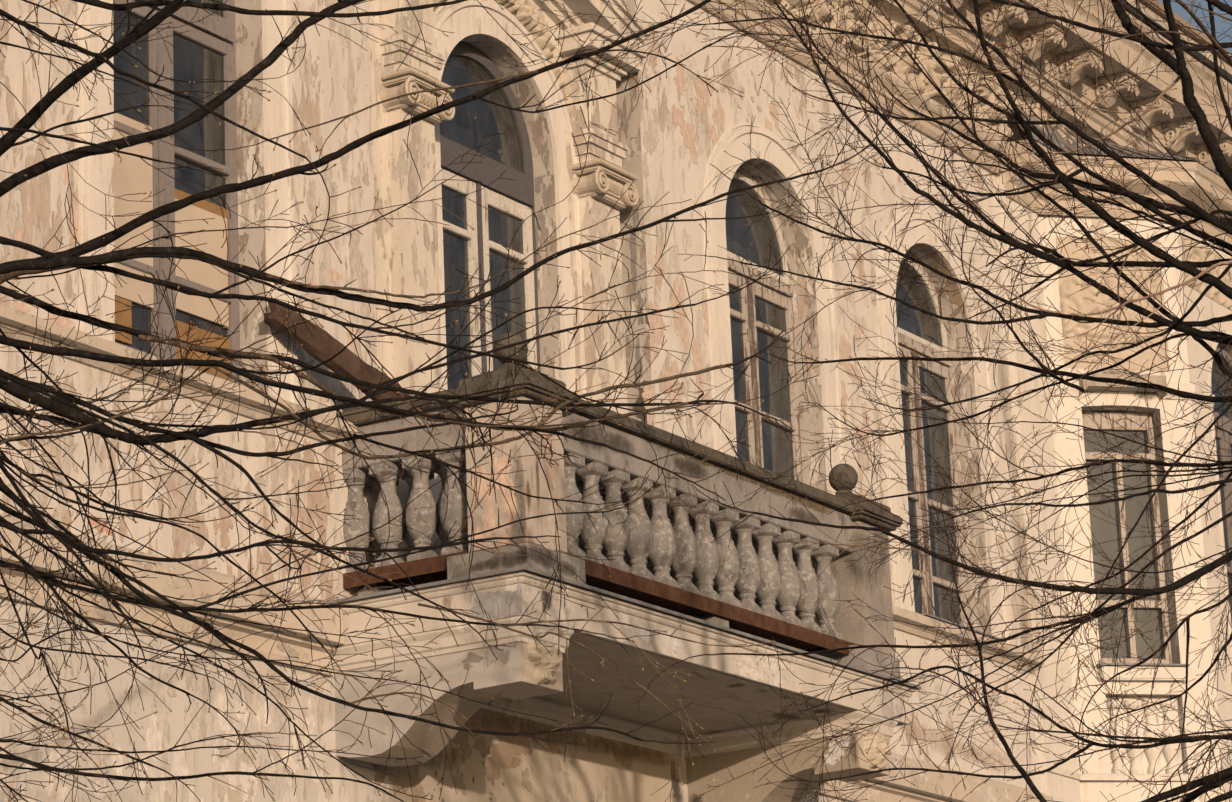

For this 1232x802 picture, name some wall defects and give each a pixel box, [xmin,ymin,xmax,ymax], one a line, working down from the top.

flaking render [642,30,793,164]
peeling [0,670,333,802]
flaking render [366,717,562,802]